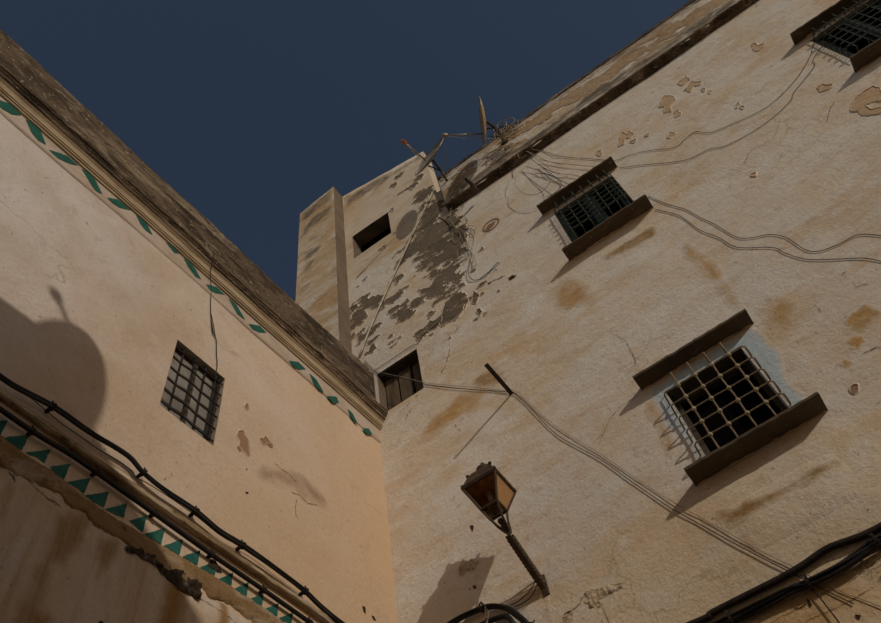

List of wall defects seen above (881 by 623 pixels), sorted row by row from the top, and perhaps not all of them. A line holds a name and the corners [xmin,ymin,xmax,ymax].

flaking render [497,0,728,157]
flaking render [849,86,881,117]
flaking render [349,158,501,356]
flaking render [848,383,861,396]
damp [420,383,490,443]
flaking render [235,429,273,457]
damp [714,459,845,530]
spalling [126,546,202,599]
spalling [458,559,479,576]
crack [564,582,623,623]
spalling [584,584,624,608]